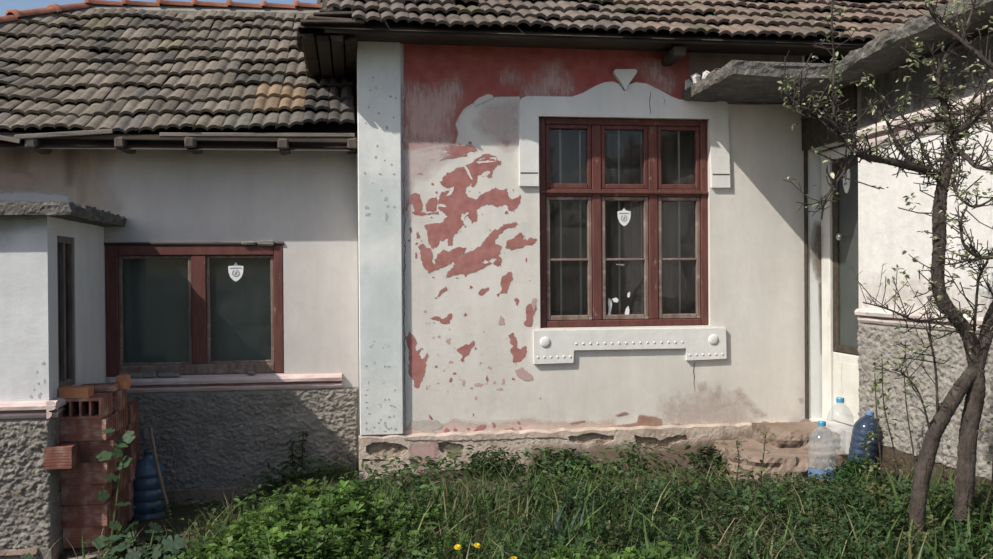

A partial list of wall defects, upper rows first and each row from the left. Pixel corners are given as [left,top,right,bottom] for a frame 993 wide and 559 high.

peeling [364,44,802,327]
peeling [405,316,533,400]
spalling [362,389,464,476]
spalling [568,412,687,451]
water stain [531,434,752,475]